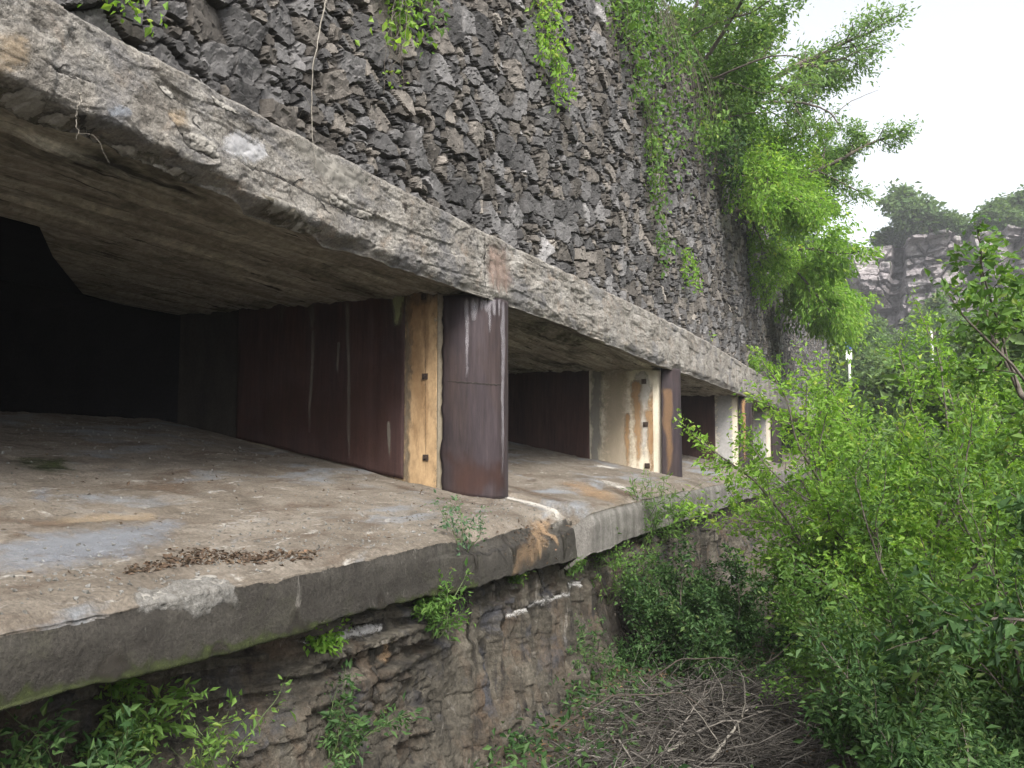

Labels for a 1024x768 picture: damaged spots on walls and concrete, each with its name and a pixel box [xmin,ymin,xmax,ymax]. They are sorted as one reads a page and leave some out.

corrosion [624,380,654,471]
corrosion [520,522,558,560]